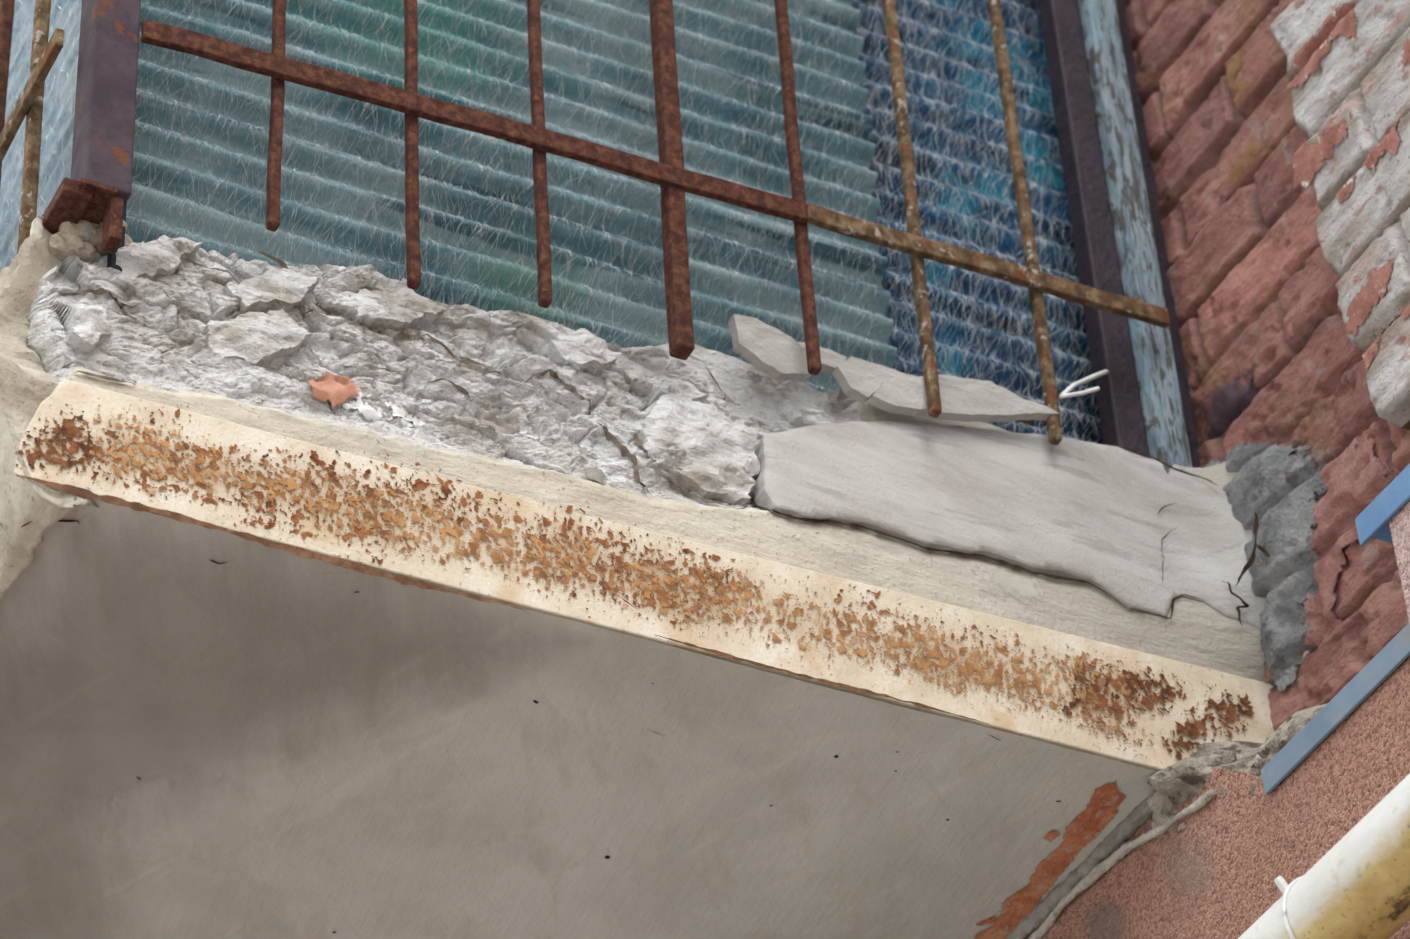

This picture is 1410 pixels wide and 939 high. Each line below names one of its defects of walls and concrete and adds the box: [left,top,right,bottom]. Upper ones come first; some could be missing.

peeling [1286,1,1358,90]
peeling [1401,38,1410,64]
peeling [1291,113,1352,190]
peeling [1336,116,1404,204]
peeling [1343,256,1396,337]
peeling [1362,304,1410,370]
spalling [27,219,1266,630]
crack [343,332,1270,625]
crack [0,520,80,538]
rust [15,399,1254,760]
flaking render [975,781,1126,939]